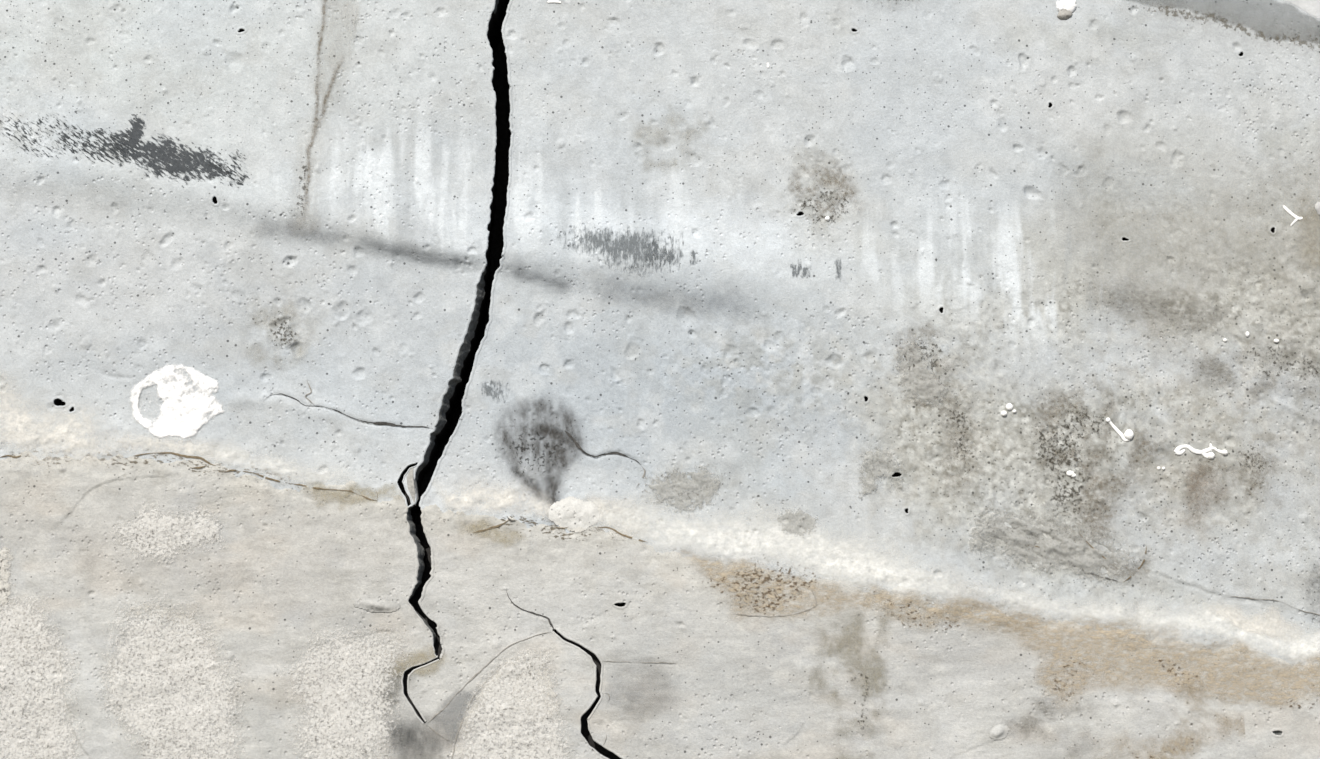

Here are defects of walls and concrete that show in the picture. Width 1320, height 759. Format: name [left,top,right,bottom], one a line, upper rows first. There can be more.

damp [1153,6,1320,48]
damp [69,114,146,166]
damp [209,149,250,186]
crack [1,0,672,759]
damp [540,427,568,442]
damp [1005,592,1320,663]